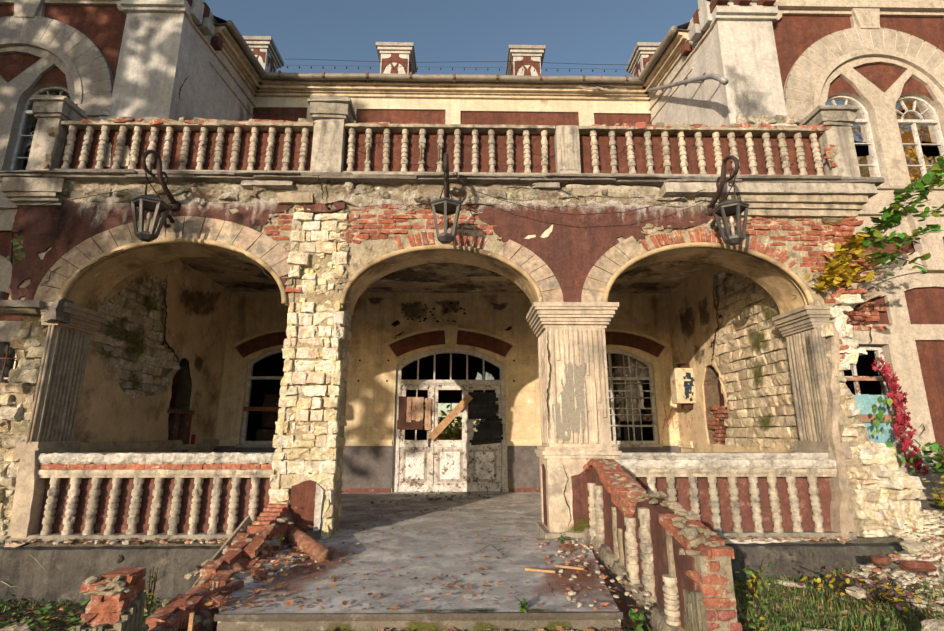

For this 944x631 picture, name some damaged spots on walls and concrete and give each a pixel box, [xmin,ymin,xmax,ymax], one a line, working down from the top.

crack [161,275,187,367]
peeling [236,271,302,293]
spalling [254,202,507,293]
peeling [382,263,507,339]
crack [544,324,552,437]
peeling [551,361,589,442]
peeling [618,271,657,290]
crack [710,280,723,365]
spalling [704,270,800,451]
spalling [637,216,887,331]
spalling [821,323,834,338]